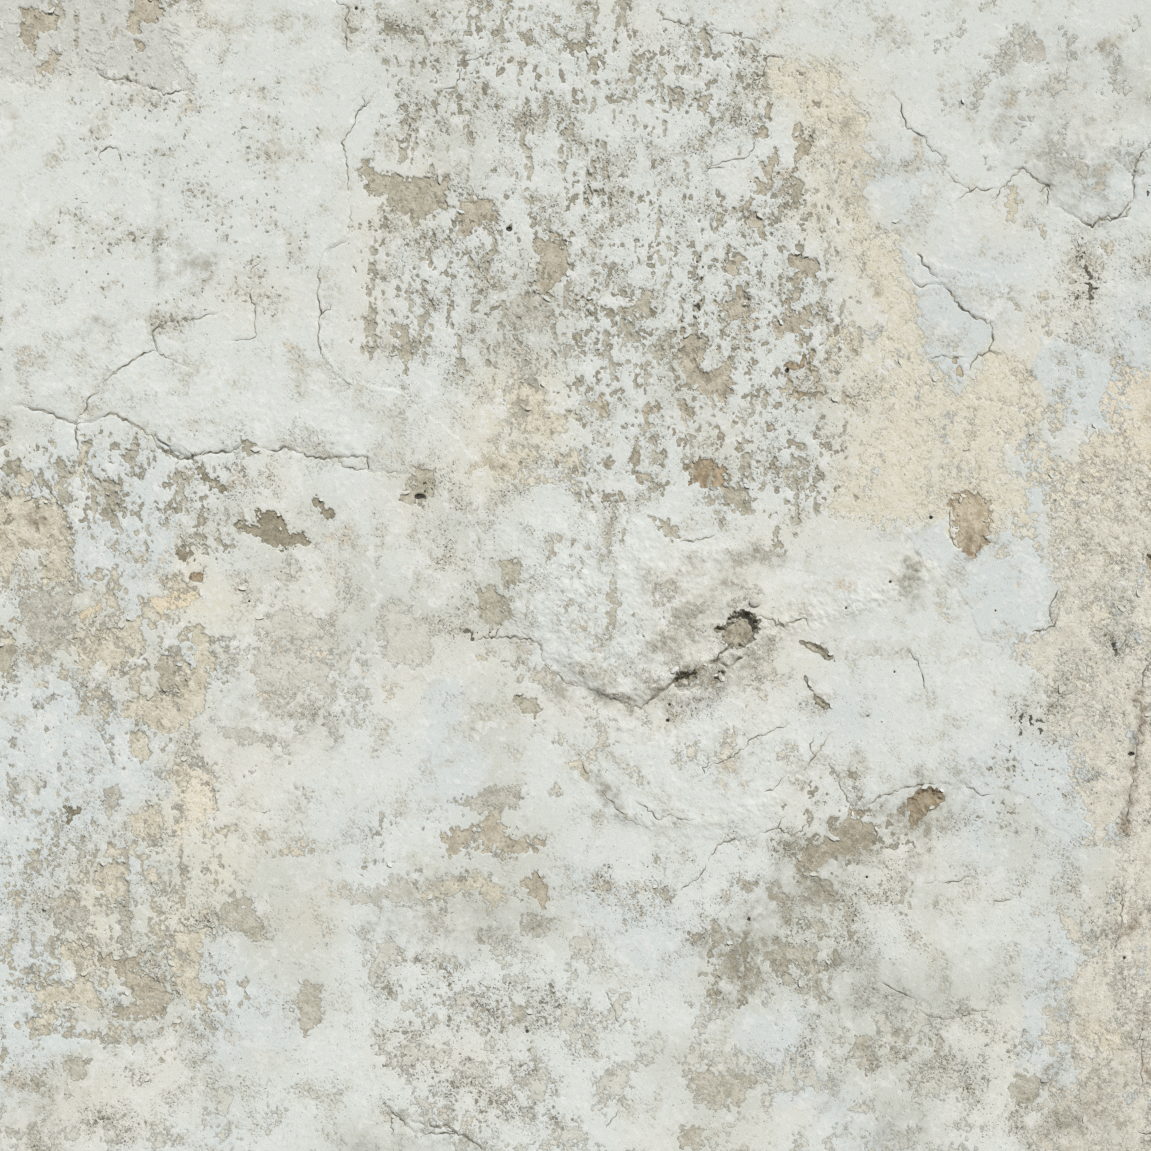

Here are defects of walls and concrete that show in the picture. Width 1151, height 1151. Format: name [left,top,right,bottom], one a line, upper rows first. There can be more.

crack [98,73,187,96]
crack [897,98,1151,228]
crack [317,96,371,387]
crack [913,253,995,369]
crack [25,313,401,474]
peeling [337,0,1151,1151]
peeling [0,419,442,1100]
crack [605,795,694,825]
crack [696,724,788,778]
crack [682,817,806,888]
crack [764,735,989,810]
peeling [0,1104,126,1151]